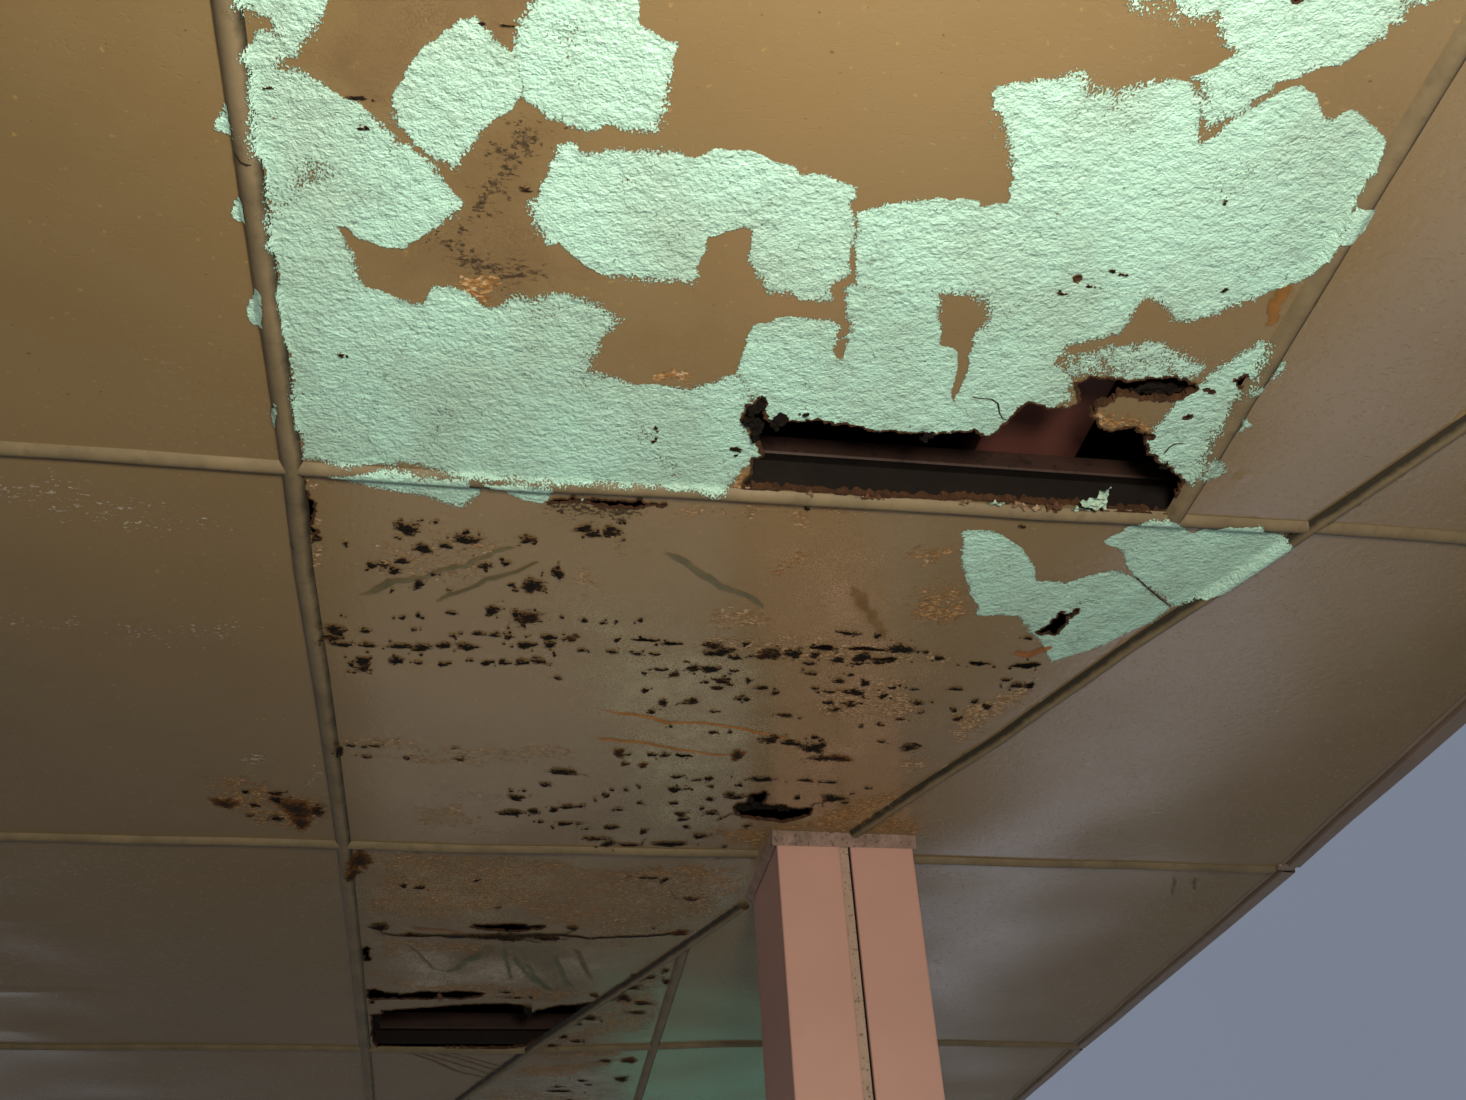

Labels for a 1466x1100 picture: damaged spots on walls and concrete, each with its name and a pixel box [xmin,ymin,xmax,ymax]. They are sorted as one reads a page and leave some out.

peeling [1128,380,1187,396]
peeling [742,397,809,444]
peeling [917,431,935,443]
peeling [989,487,1112,513]
damp [359,494,996,939]
damp [356,843,672,1041]